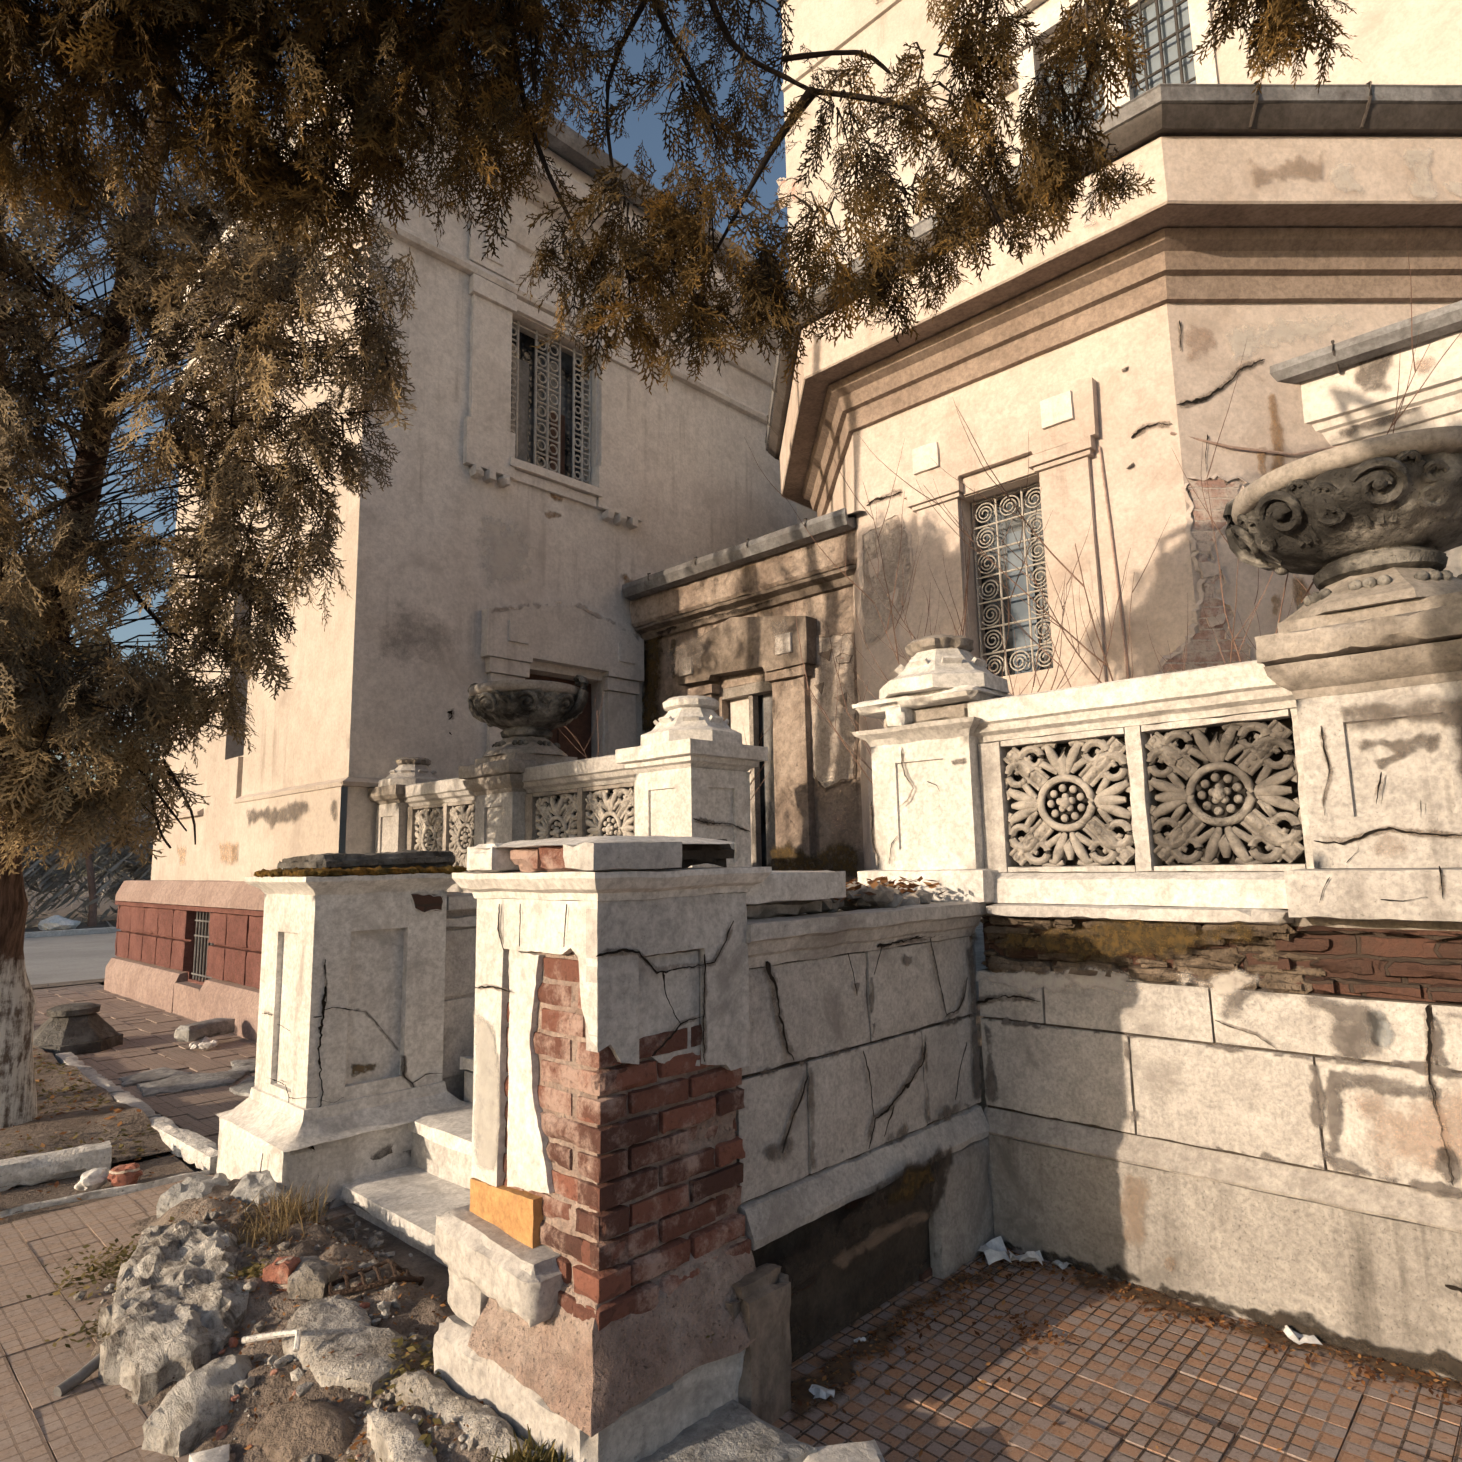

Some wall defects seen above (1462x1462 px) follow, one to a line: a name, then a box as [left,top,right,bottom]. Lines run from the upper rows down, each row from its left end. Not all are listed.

crack [1131,359,1265,493]
peeling [809,513,915,791]
spalling [1153,474,1253,675]
crack [1315,726,1462,903]
crack [262,959,440,1107]
crack [765,961,809,1153]
crack [848,935,1041,1148]
crack [1425,1005,1455,1186]
damp [790,1260,927,1360]
damp [783,1148,953,1297]
damp [1041,1250,1139,1282]
damp [1158,1283,1462,1383]